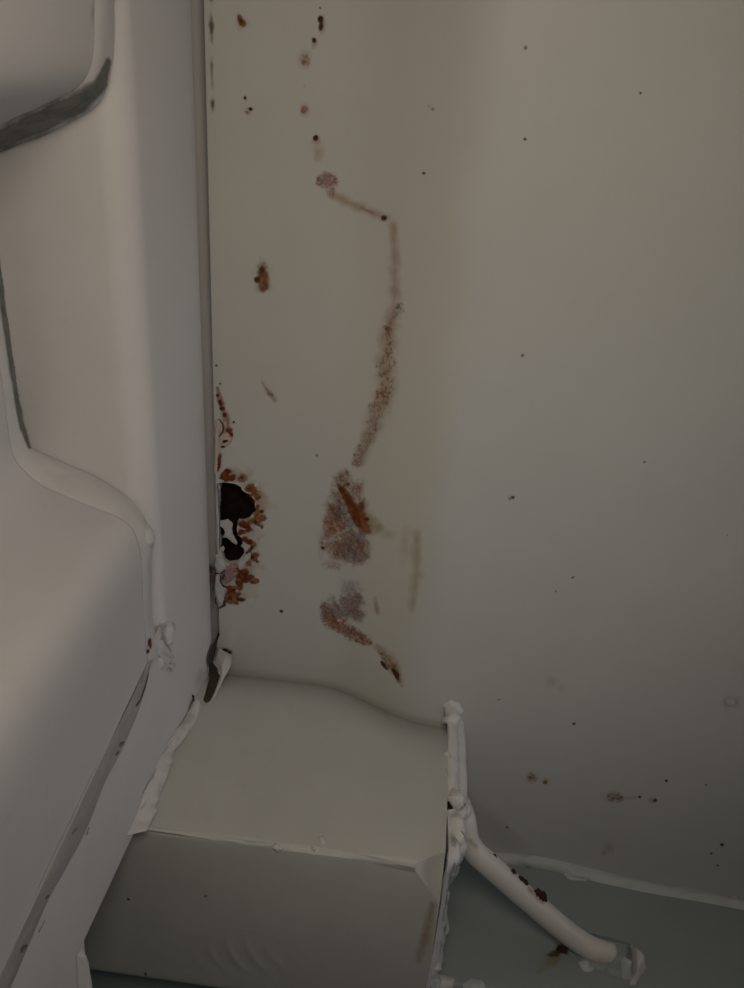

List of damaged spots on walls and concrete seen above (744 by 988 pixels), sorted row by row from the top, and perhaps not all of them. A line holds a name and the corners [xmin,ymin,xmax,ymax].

rust [254,268,268,292]
spalling [213,482,256,609]
rust [214,383,266,605]
rust [321,460,370,563]
rust [320,593,371,644]
rust [511,869,547,902]